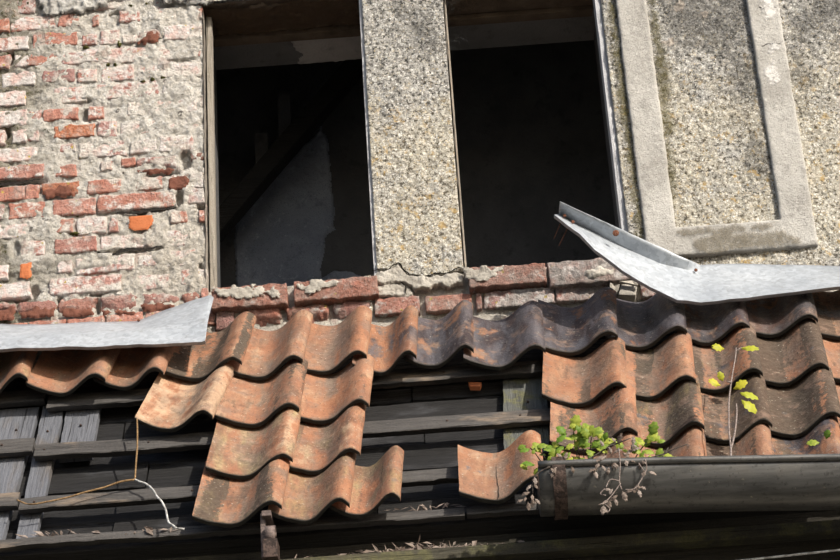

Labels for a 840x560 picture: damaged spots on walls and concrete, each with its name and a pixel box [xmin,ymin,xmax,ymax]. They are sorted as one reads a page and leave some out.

flaking render [39,0,110,17]
spalling [137,31,160,45]
spalling [137,168,189,190]
spalling [44,185,75,200]
spalling [129,215,153,231]
spalling [20,262,32,279]
crack [372,262,463,293]
spalling [0,302,175,321]